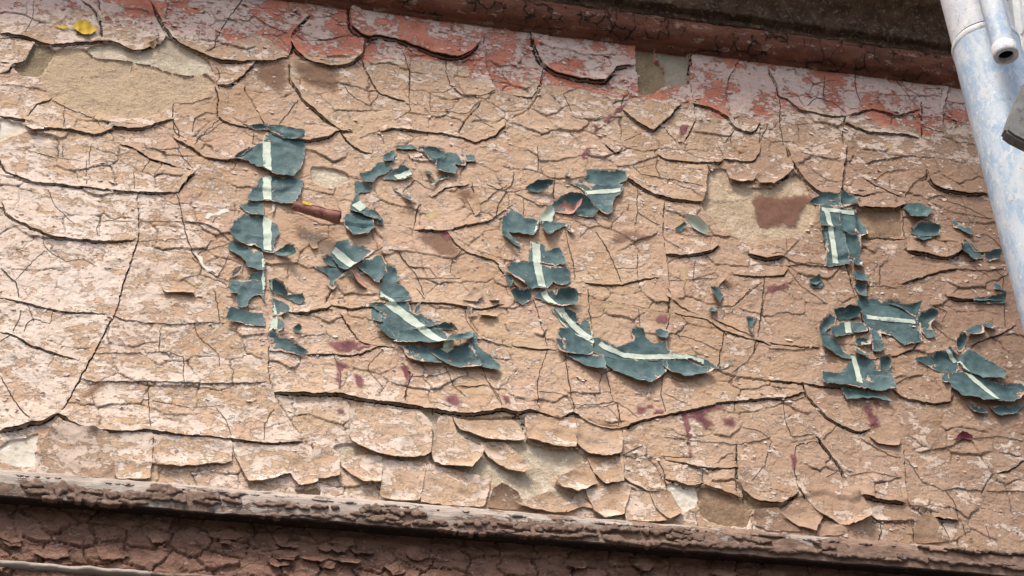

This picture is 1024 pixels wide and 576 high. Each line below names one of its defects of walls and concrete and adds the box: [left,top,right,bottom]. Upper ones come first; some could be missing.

flaking render [15,39,214,119]
crack [0,0,639,154]
peeling [225,119,501,371]
crack [0,54,927,542]
flaking render [423,412,587,502]
peeling [501,168,734,382]
flaking render [702,170,1007,402]
crack [768,68,1016,371]
crack [909,462,968,510]
crack [931,512,958,537]
peeling [915,322,1024,416]
crack [918,436,1022,452]